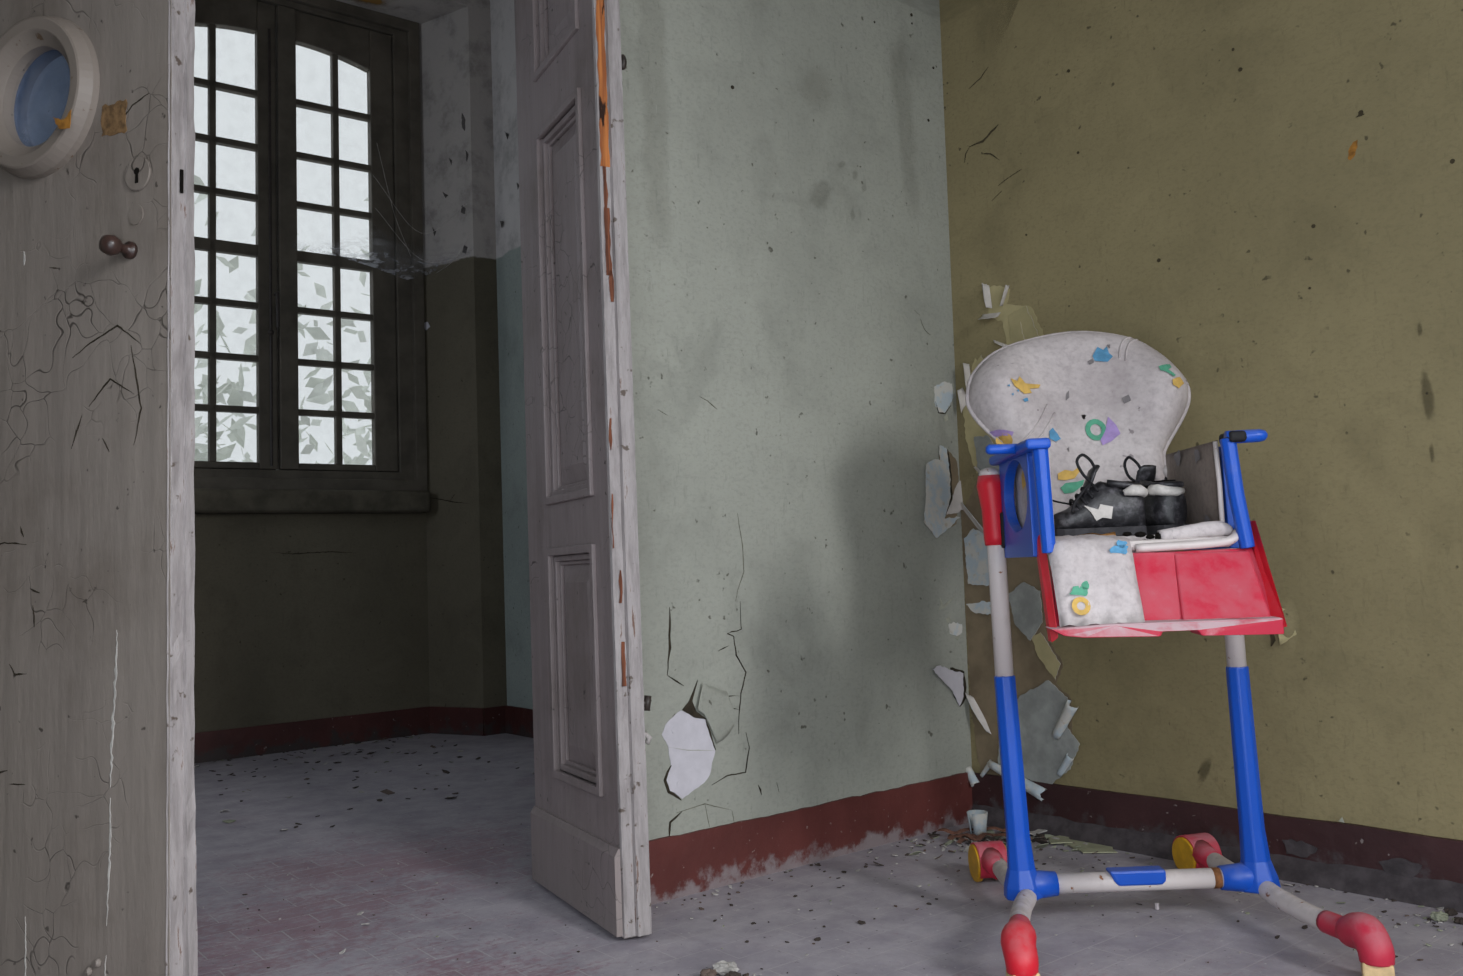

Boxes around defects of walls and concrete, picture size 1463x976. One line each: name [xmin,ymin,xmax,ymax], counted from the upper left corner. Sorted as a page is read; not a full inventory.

peeling [978,283,1044,347]
crack [667,607,684,686]
crack [719,513,747,731]
peeling [924,356,1002,787]
peeling [1006,557,1080,801]
peeling [662,680,750,836]
crack [677,785,779,827]